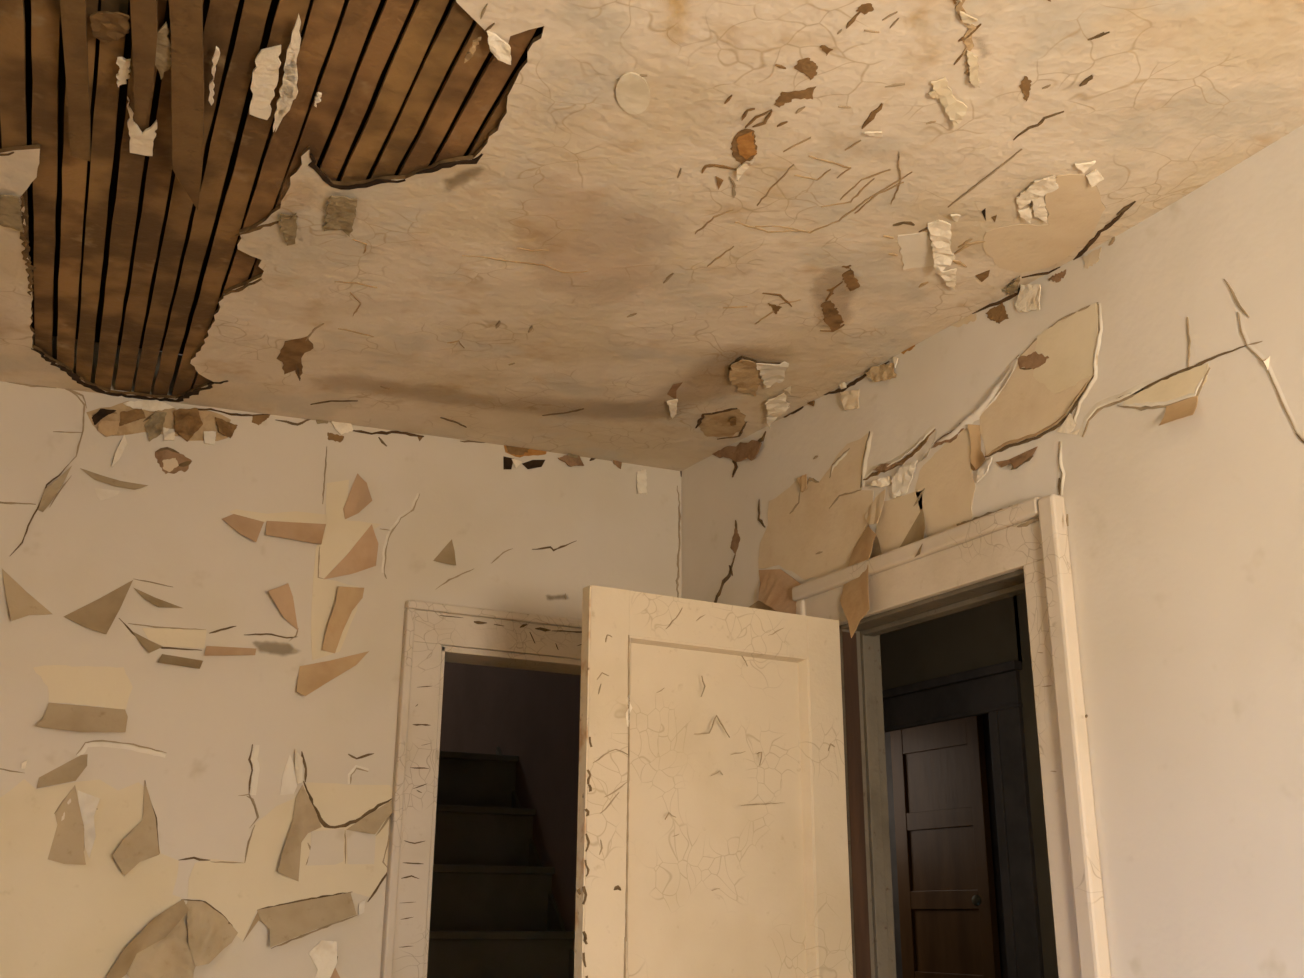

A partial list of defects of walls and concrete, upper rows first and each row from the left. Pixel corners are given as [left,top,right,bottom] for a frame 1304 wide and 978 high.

flaking render [0,0,537,474]
crack [695,137,912,267]
crack [948,111,1064,208]
crack [951,201,1136,327]
crack [0,382,148,556]
crack [198,400,485,447]
peeling [667,382,683,419]
peeling [695,345,915,477]
peeling [758,302,1099,580]
crack [957,303,1154,527]
peeling [297,473,381,696]
peeling [0,744,393,978]